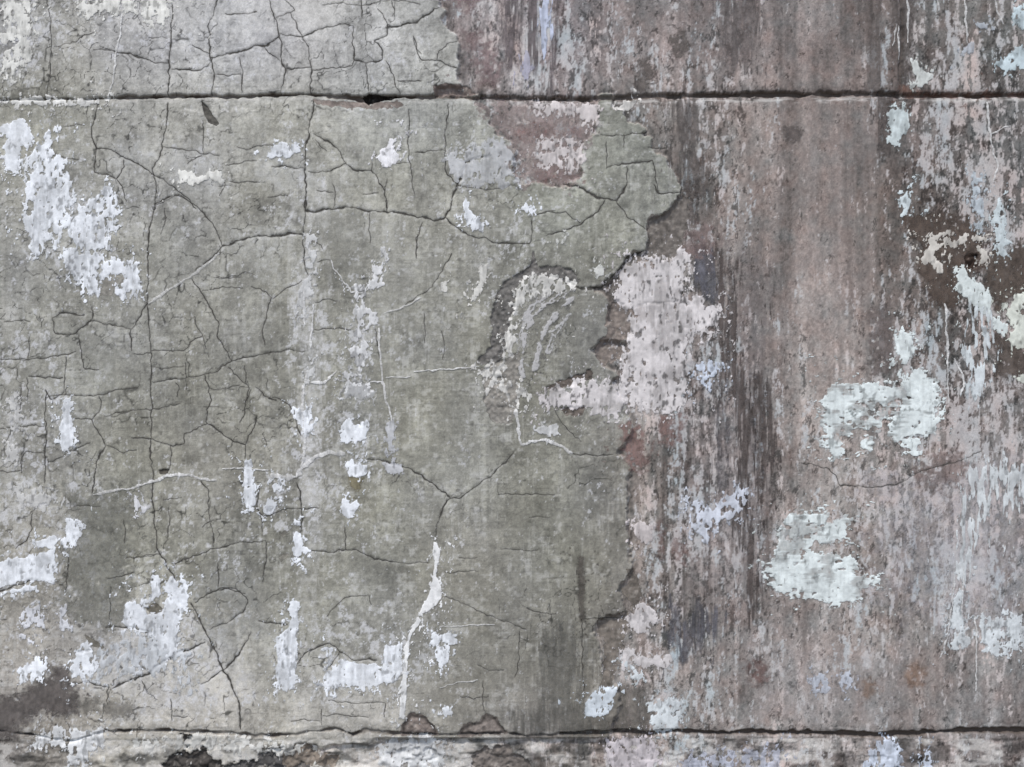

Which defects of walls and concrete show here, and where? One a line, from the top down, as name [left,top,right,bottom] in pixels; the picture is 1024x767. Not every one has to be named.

peeling [0,0,155,310]
peeling [441,0,645,232]
peeling [883,55,936,151]
peeling [0,479,206,701]
crack [0,0,681,729]
peeling [258,535,508,767]
peeling [456,195,737,445]
spalling [558,569,797,767]
peeling [677,480,892,610]
crack [803,451,981,488]
peeling [805,163,1024,472]
peeling [933,441,1024,670]